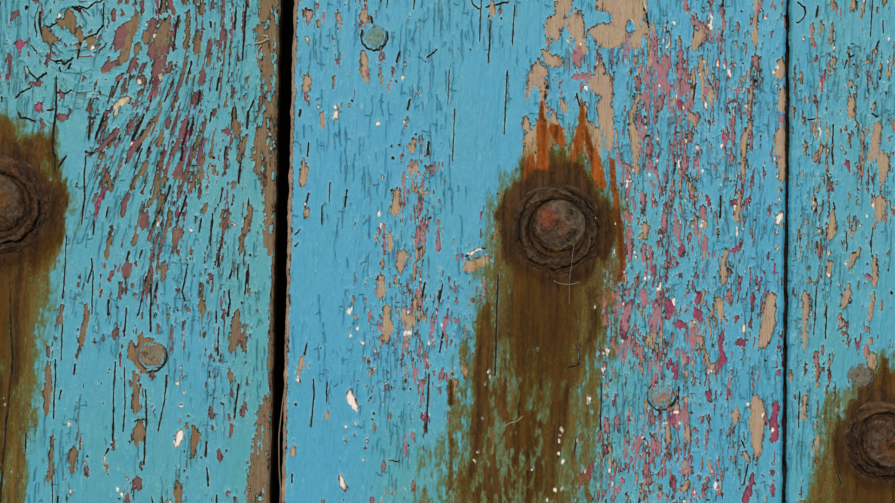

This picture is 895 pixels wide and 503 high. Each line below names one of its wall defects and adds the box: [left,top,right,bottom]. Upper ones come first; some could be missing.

corrosion [0,121,66,503]
crack [53,324,76,419]
crack [2,0,255,356]
crack [87,250,227,503]
peeling [0,0,377,503]
crack [210,383,239,418]
crack [226,0,263,73]
peeling [359,46,407,91]
peeling [489,0,502,18]
corrosion [446,99,625,503]
peeling [521,0,895,503]
corrosion [809,358,895,503]